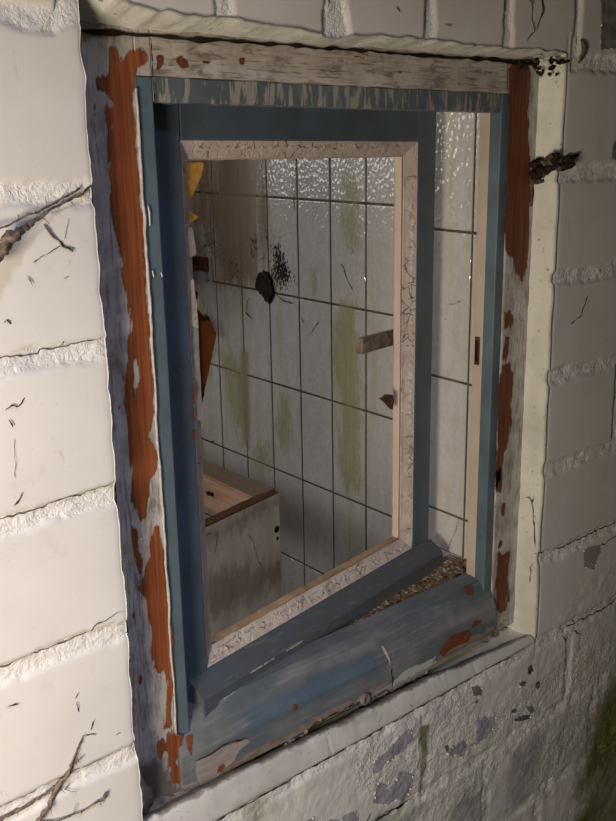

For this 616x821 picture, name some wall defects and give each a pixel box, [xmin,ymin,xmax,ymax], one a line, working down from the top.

peeling [600,0,616,50]
peeling [504,59,531,282]
peeling [96,46,250,786]
peeling [494,310,513,493]
peeling [494,540,510,613]
crack [562,598,616,642]
peeling [371,620,502,700]
peeling [371,728,413,806]
peeling [445,712,497,758]
spalling [511,706,534,721]
peeling [327,811,360,821]